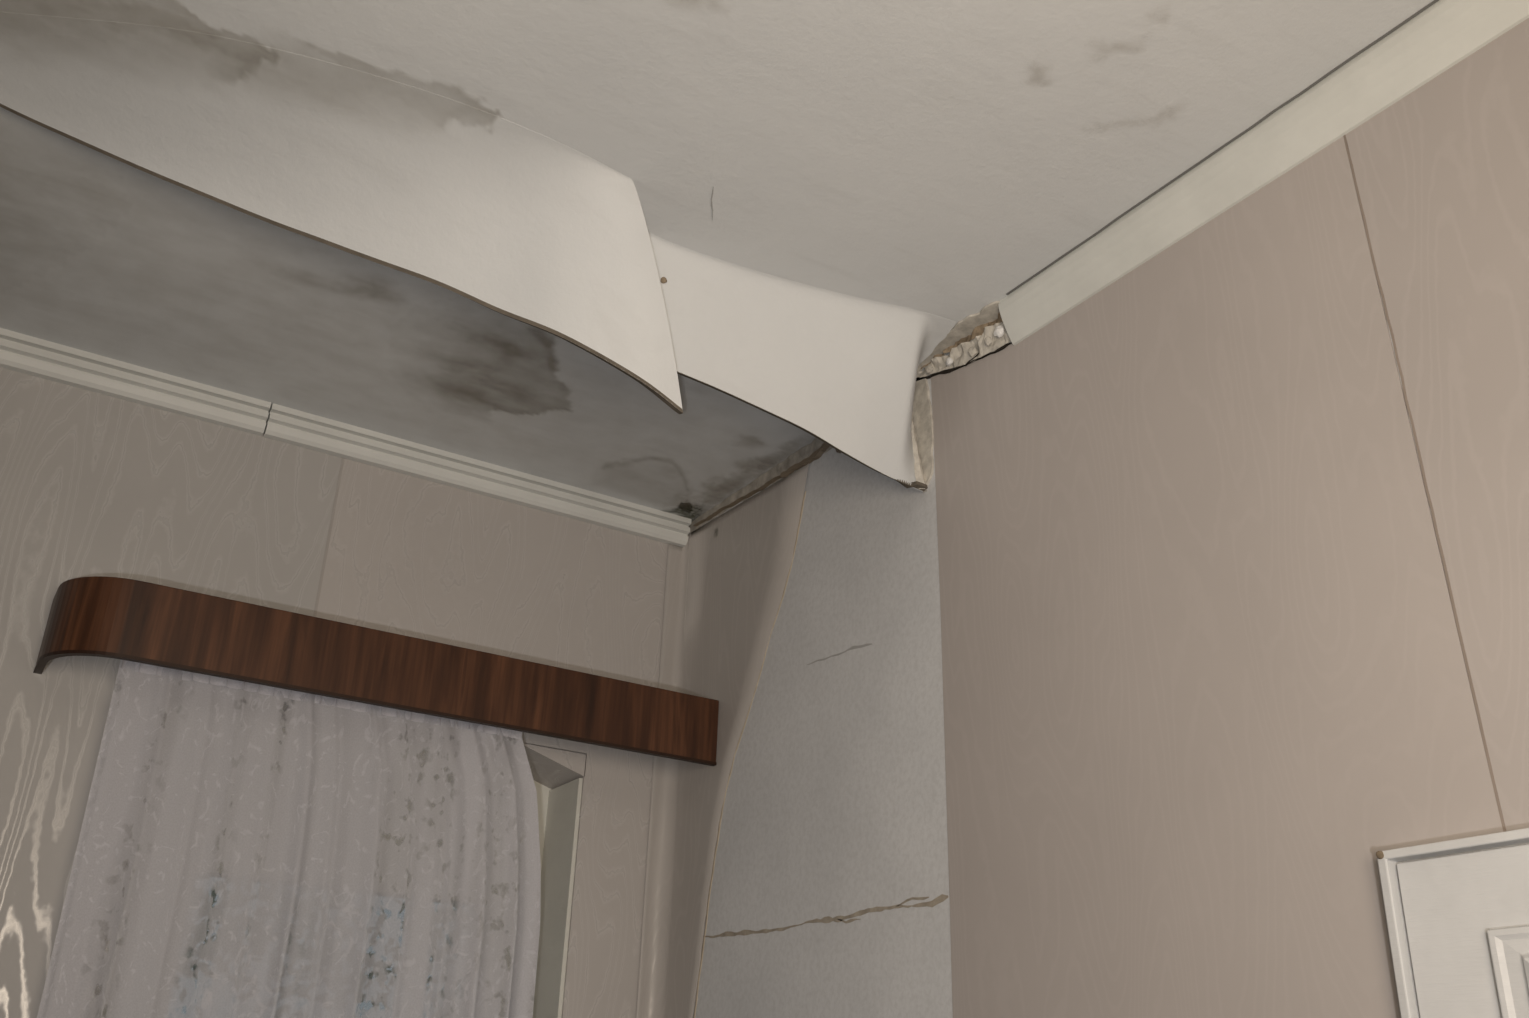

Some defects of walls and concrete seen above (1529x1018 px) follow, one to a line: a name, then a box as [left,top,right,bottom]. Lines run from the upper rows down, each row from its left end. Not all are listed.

flaking render [912,301,1011,486]
crack [703,894,948,938]